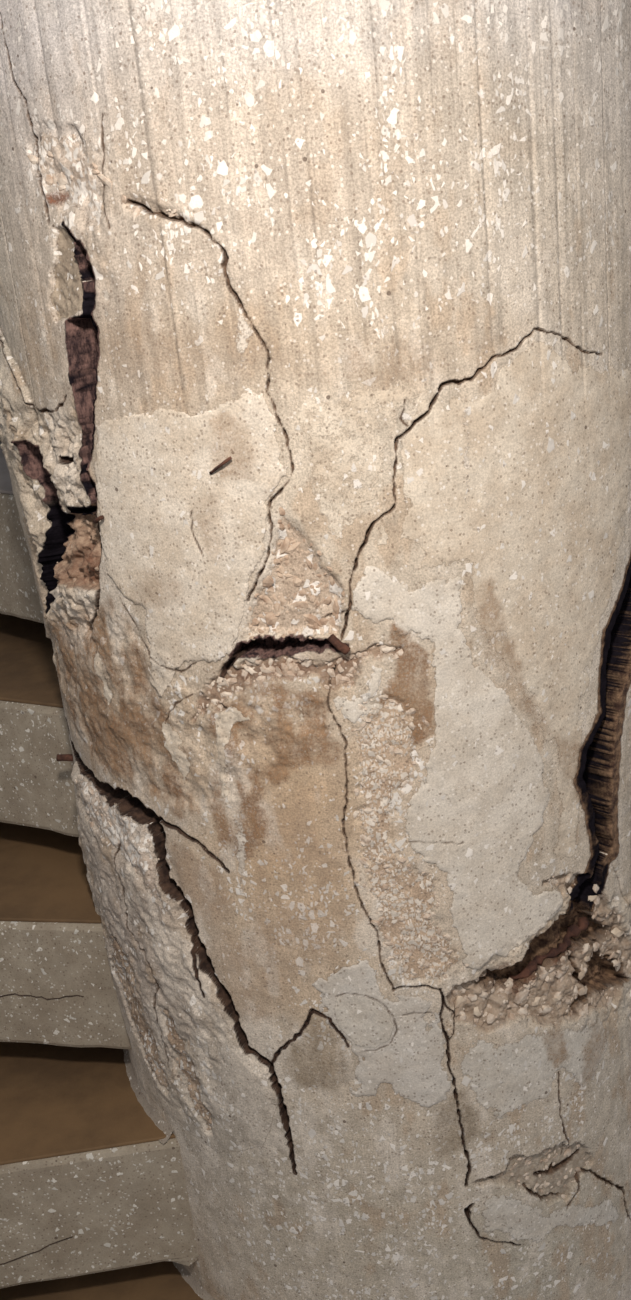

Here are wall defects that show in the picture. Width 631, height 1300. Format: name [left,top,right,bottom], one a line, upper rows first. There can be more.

crack [2,23,50,222]
crack [13,375,67,413]
spalling [50,228,84,320]
crack [102,115,294,601]
crack [124,605,197,720]
peeling [53,341,631,1130]
crack [325,328,629,1245]
peeling [476,1142,619,1243]